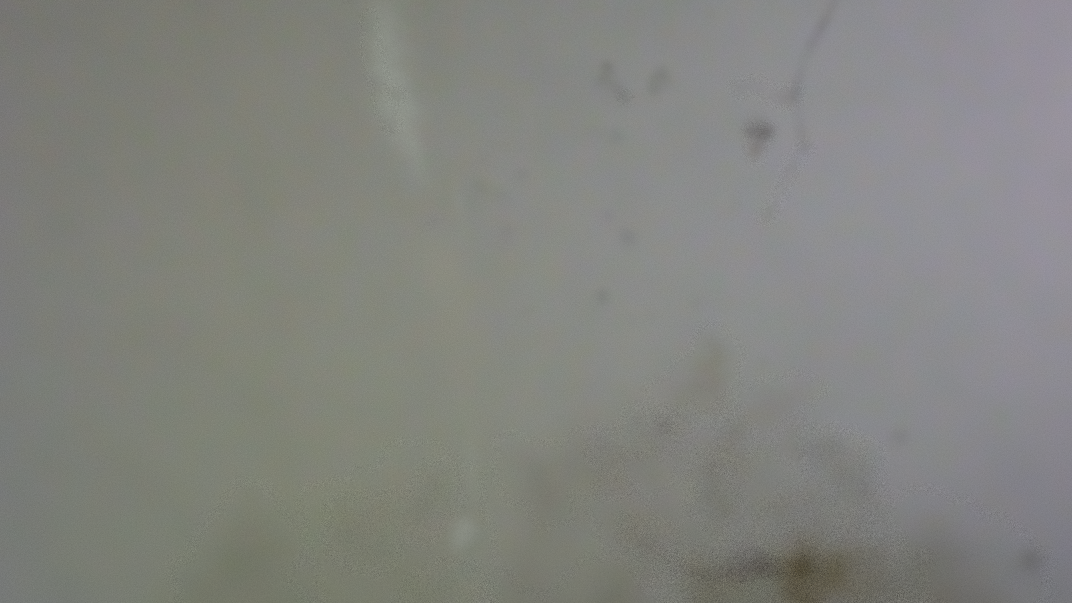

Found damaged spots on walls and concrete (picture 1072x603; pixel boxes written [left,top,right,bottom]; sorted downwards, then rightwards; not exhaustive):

damp [460,310,1034,603]